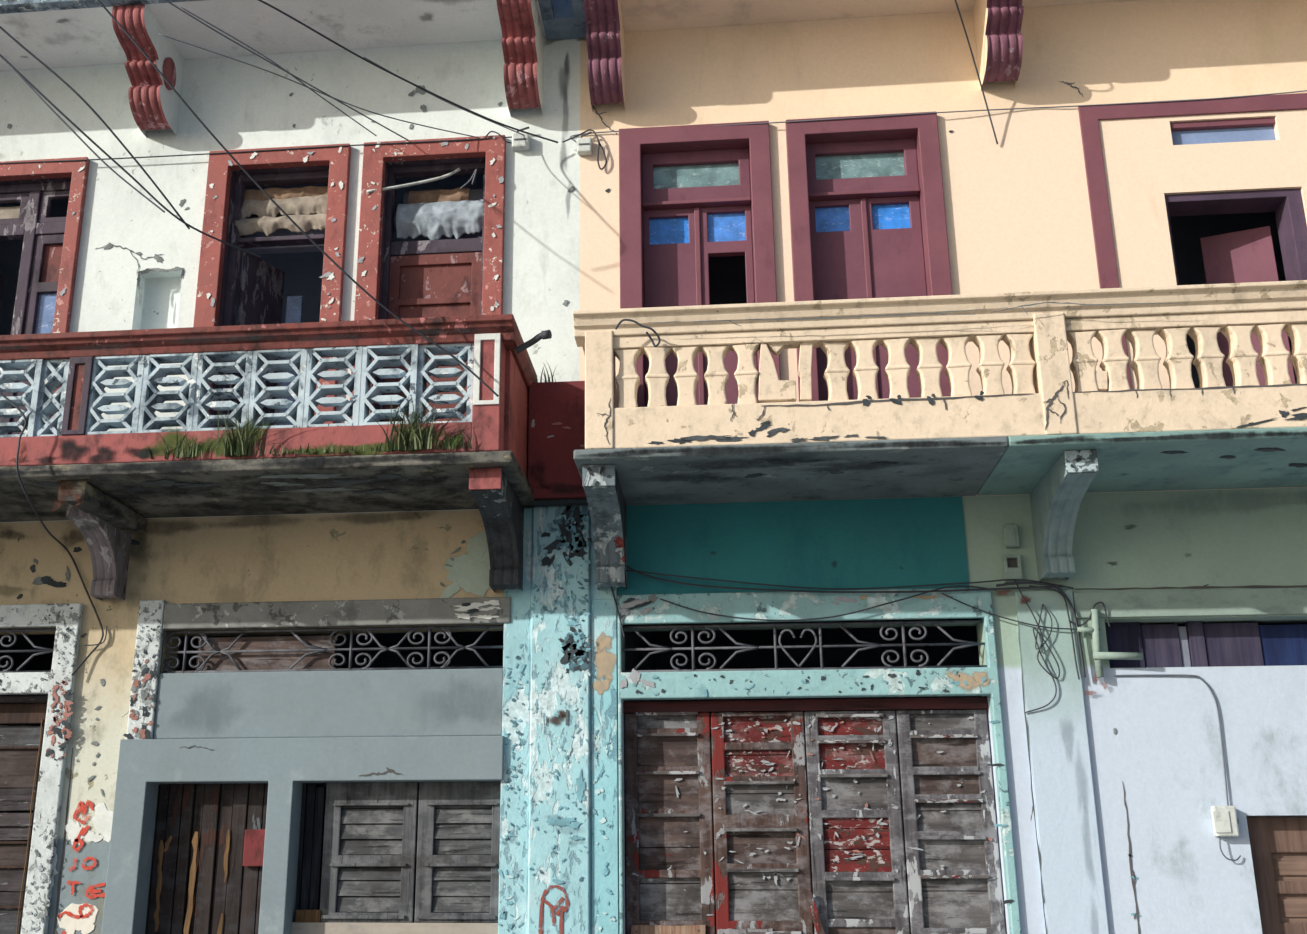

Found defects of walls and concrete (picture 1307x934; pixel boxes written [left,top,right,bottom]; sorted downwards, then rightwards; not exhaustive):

crack [96,243,163,271]
crack [730,380,1307,431]
water stain [0,440,212,495]
water stain [282,454,469,482]
peeling [440,532,501,620]
peeling [123,603,161,739]
peeling [502,505,611,862]
peeling [619,668,665,695]
peeling [838,670,925,693]
peeling [26,741,113,932]
crack [1122,781,1140,934]
peeling [497,863,584,934]